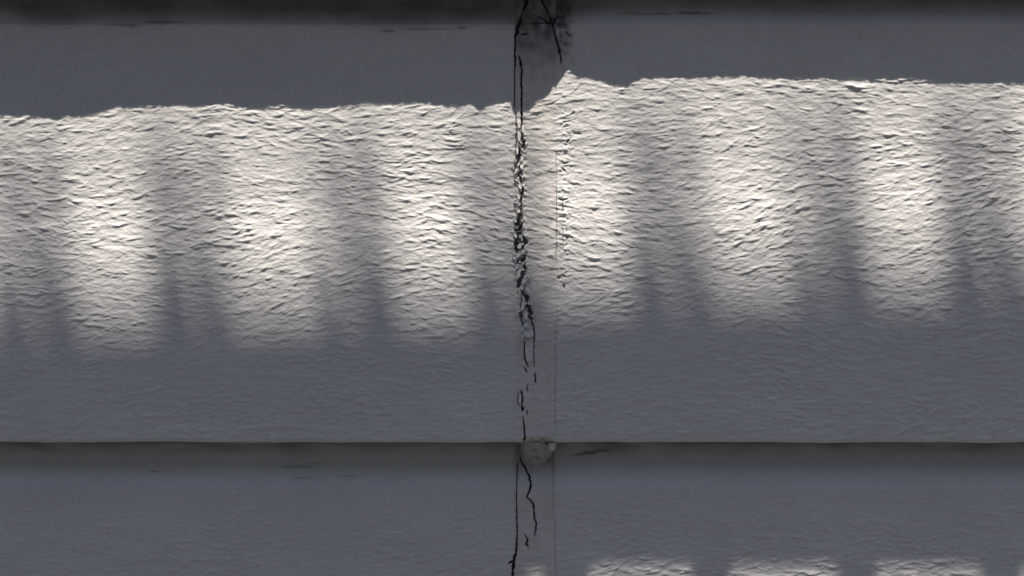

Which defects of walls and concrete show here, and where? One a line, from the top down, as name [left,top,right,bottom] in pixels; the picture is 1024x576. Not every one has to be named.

crack [509,0,570,576]